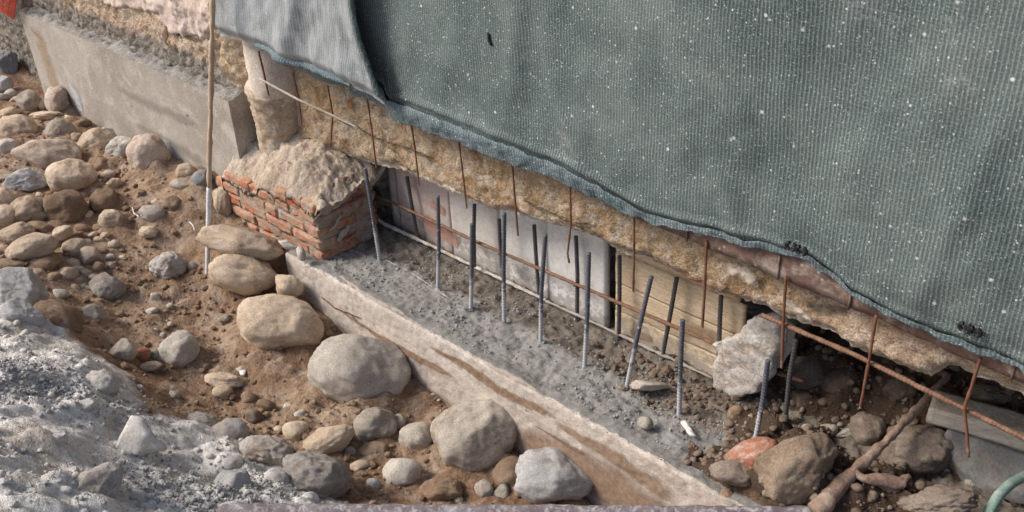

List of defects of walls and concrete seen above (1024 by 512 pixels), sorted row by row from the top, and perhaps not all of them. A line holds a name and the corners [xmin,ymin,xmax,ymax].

spalling [728,264,757,286]
crack [321,297,361,319]
spalling [753,298,1024,441]